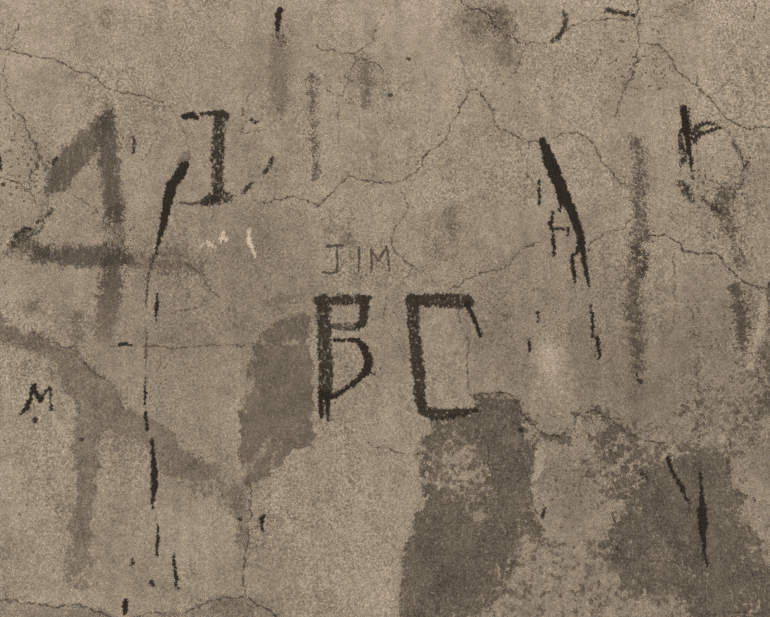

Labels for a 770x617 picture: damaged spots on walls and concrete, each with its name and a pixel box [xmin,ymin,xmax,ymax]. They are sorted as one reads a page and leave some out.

crack [0,48,163,103]
crack [461,0,541,44]
crack [566,0,769,130]
crack [7,114,40,201]
crack [263,89,538,266]
crack [648,234,770,289]
crack [458,309,670,448]
leakage [0,313,253,590]
flaking render [390,281,770,617]
crack [0,599,107,616]
crack [139,488,277,617]